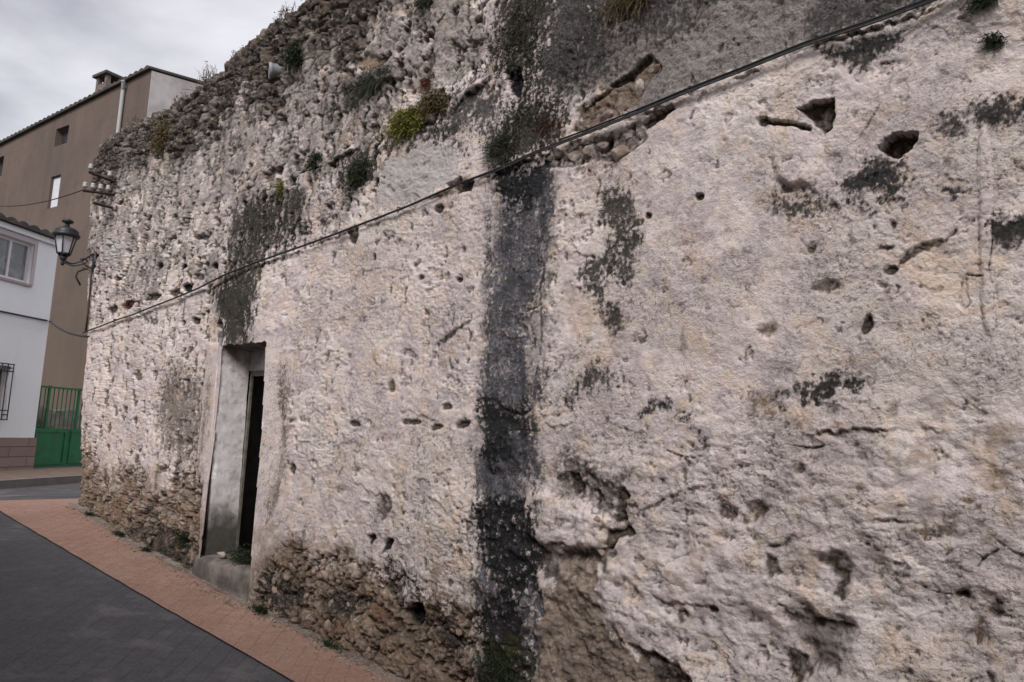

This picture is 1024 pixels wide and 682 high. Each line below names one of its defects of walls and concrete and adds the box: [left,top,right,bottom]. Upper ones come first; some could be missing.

flaking render [553,57,662,170]
damp [207,171,311,345]
damp [846,196,879,219]
damp [469,0,652,682]
flaking render [78,359,204,570]
flaking render [550,449,637,537]
flaking render [250,529,480,682]
flaking render [531,546,692,682]